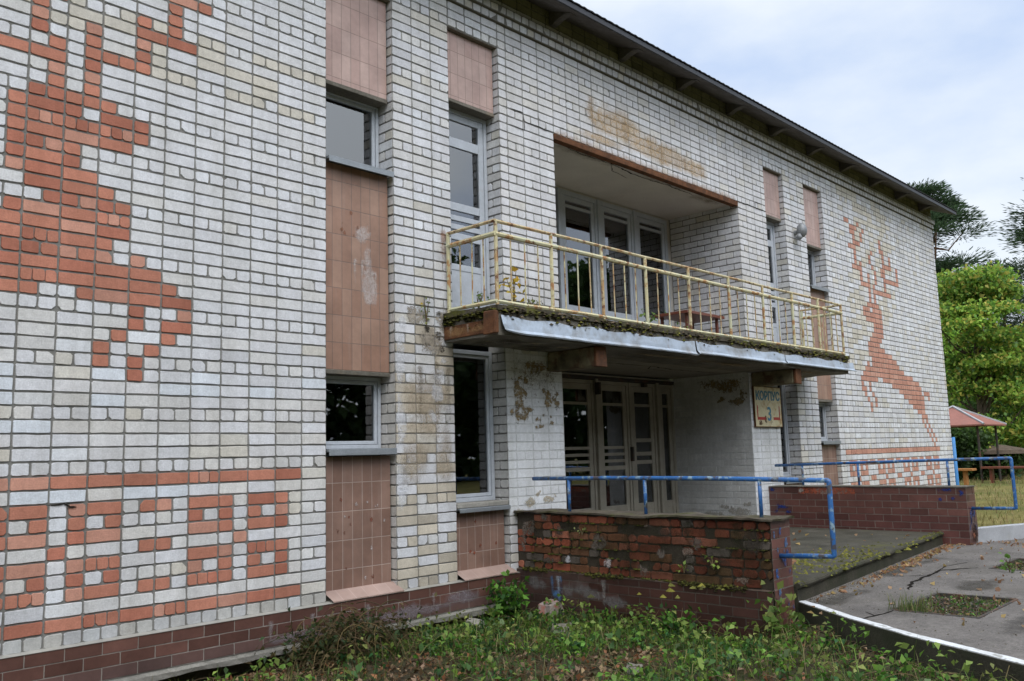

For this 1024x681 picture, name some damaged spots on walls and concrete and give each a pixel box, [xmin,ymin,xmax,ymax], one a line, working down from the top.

peeling [510,360,560,429]
crack [907,562,978,589]